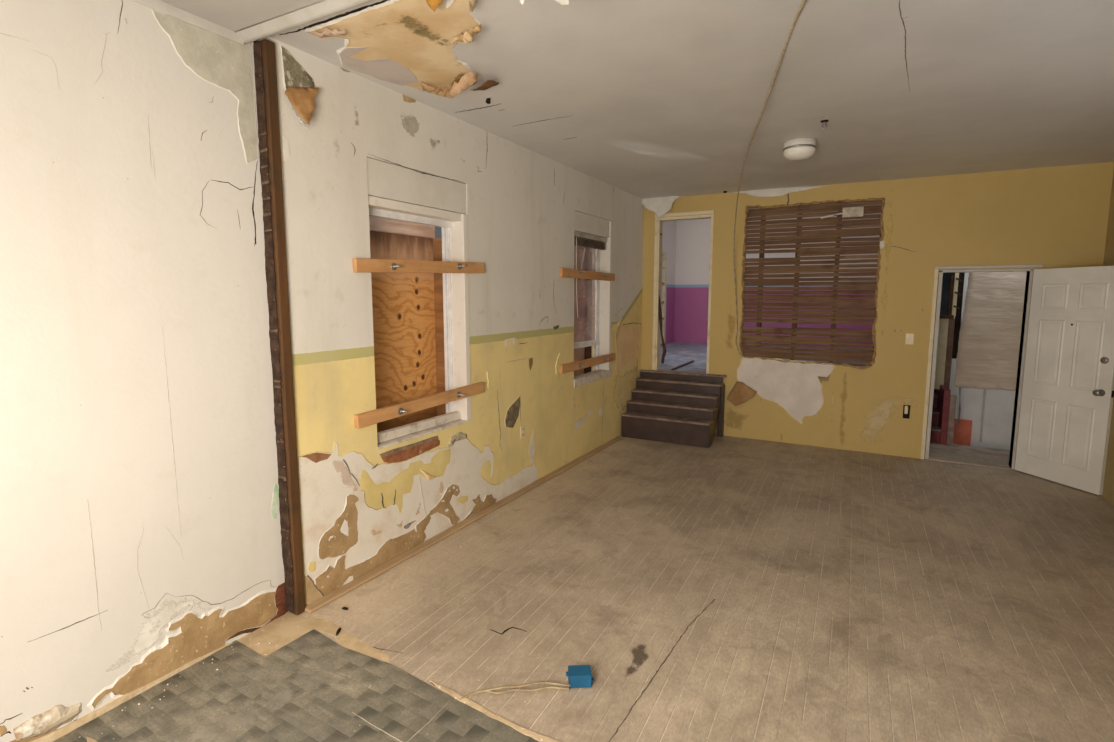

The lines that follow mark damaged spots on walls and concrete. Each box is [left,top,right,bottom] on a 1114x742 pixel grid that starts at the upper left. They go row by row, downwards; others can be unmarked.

flaking render [151,9,259,164]
spalling [280,45,315,90]
peeling [305,0,499,103]
crack [899,0,910,91]
crack [200,161,258,246]
peeling [737,197,885,424]
spalling [504,395,521,428]
peeling [297,430,538,606]
flaking render [86,580,287,711]